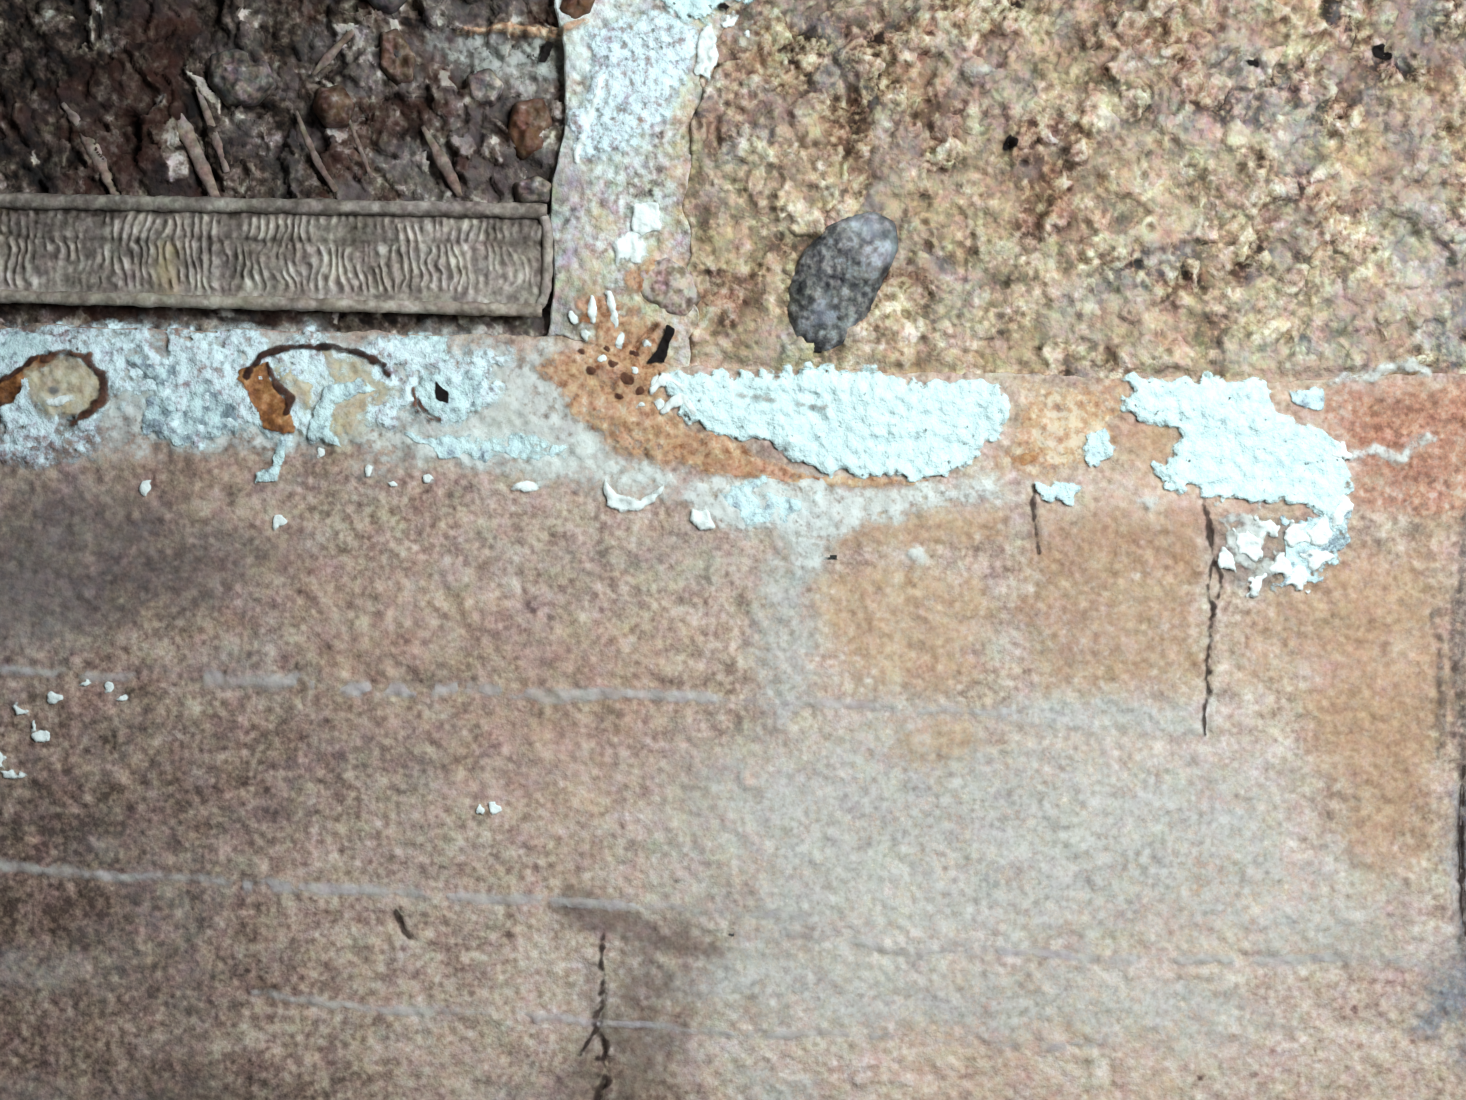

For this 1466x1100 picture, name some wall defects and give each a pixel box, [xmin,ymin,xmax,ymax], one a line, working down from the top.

spalling [0,349,109,426]
spalling [237,342,392,457]
peeling [649,373,697,415]
rust [536,257,927,488]
peeling [140,480,151,496]
peeling [273,514,287,530]
flaking render [1121,371,1354,597]
crack [1203,504,1224,735]
damp [1437,517,1466,951]
crack [1458,765,1466,936]
crack [580,935,612,1100]